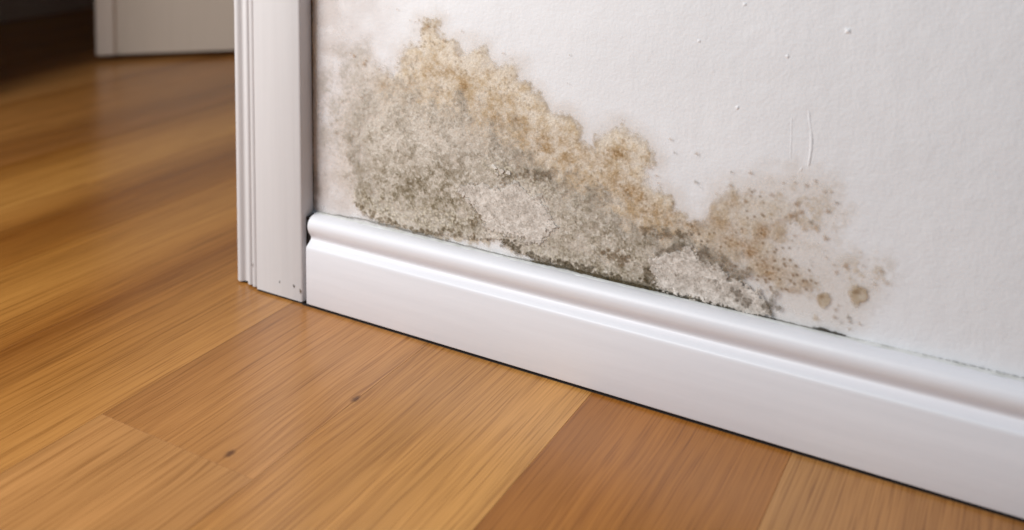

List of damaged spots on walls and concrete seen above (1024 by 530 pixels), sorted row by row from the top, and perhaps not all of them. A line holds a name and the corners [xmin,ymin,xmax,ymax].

damp [311,0,832,315]
damp [847,264,879,305]